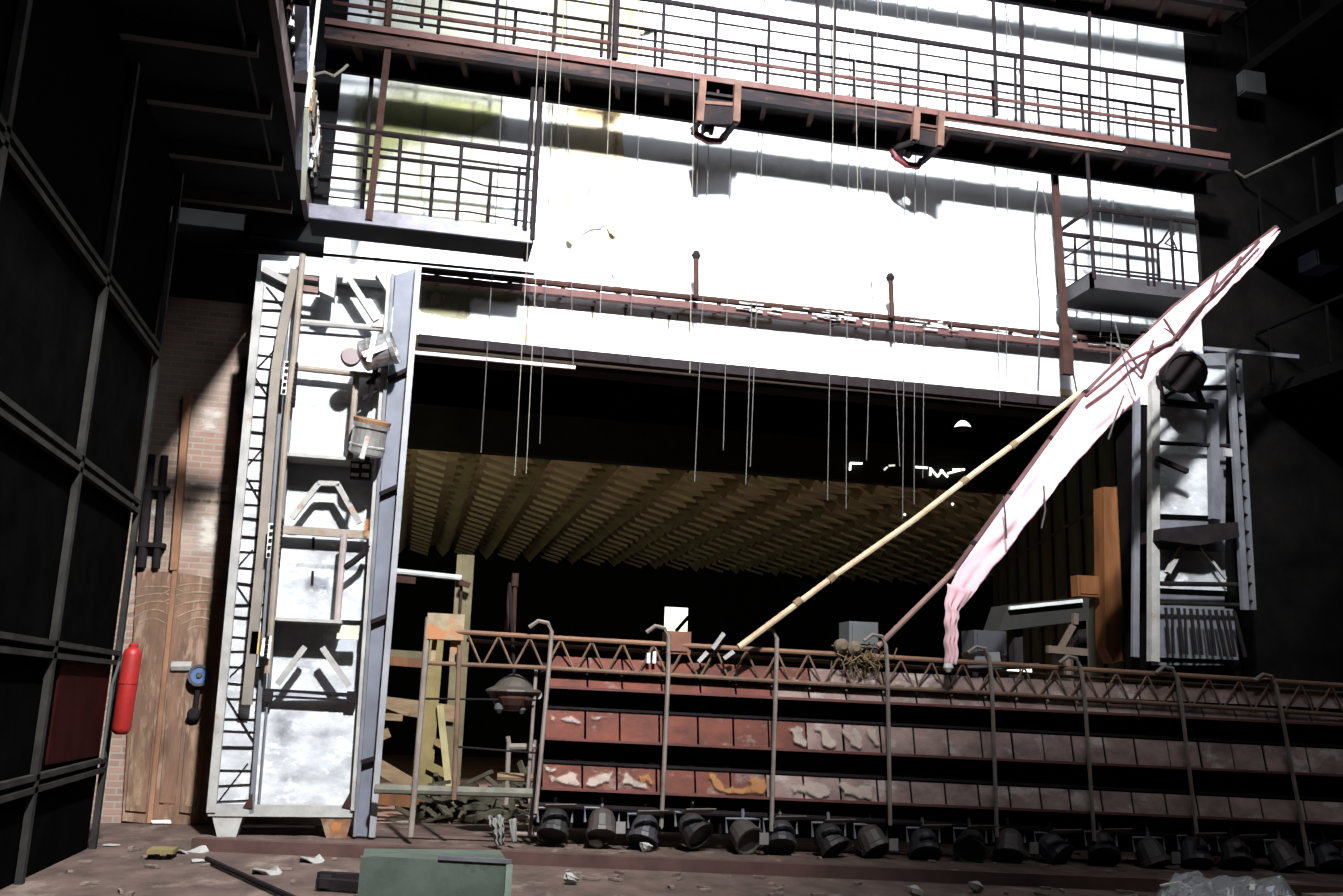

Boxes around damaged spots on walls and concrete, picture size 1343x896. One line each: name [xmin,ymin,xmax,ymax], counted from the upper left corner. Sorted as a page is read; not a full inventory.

peeling [563,106,625,287]
peeling [790,726,880,748]
peeling [546,767,647,788]
peeling [792,781,872,799]